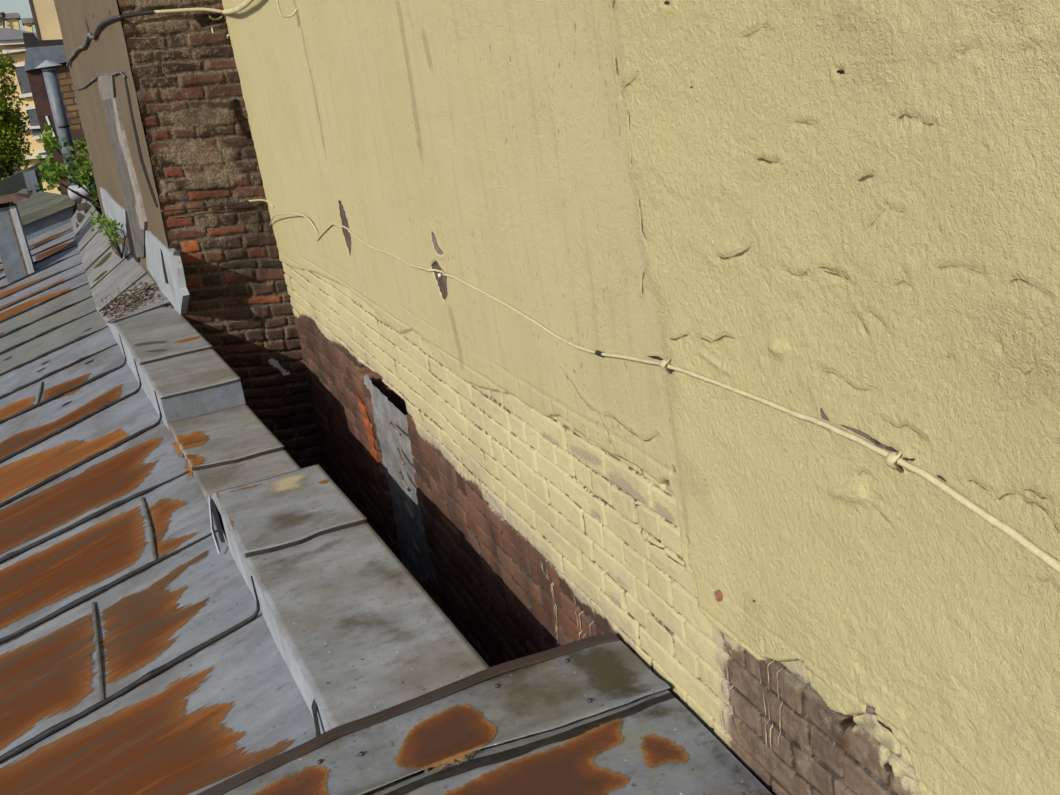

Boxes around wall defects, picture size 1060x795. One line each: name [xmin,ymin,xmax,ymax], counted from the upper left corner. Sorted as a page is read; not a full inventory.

crack [719,247,749,259]
crack [787,267,848,280]
crack [670,334,735,343]
spalling [352,391,380,465]
corrosion [0,384,208,554]
crack [969,480,1060,533]
corrosion [0,498,196,630]
corrosion [0,550,209,750]
corrosion [0,666,295,795]
corrosion [394,704,497,773]
corrosion [442,719,630,795]
spalling [866,705,893,734]